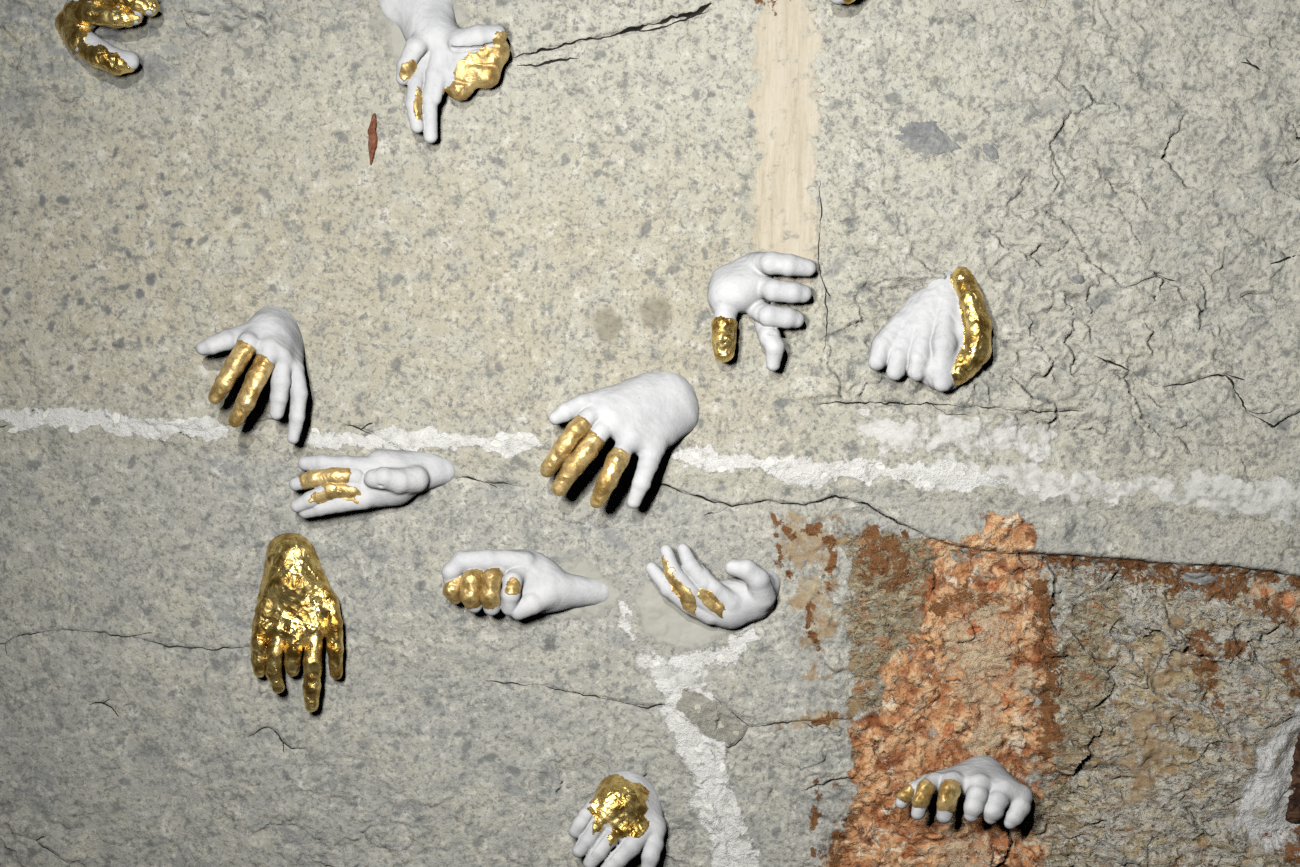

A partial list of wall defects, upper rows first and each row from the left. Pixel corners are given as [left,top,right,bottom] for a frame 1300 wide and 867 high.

crack [512,3,712,67]
crack [1094,355,1300,428]
crack [651,483,926,537]
crack [1009,552,1297,577]
flaking render [1175,571,1218,585]
crack [0,629,247,654]
rust [809,511,1300,867]
spalling [1227,704,1300,853]